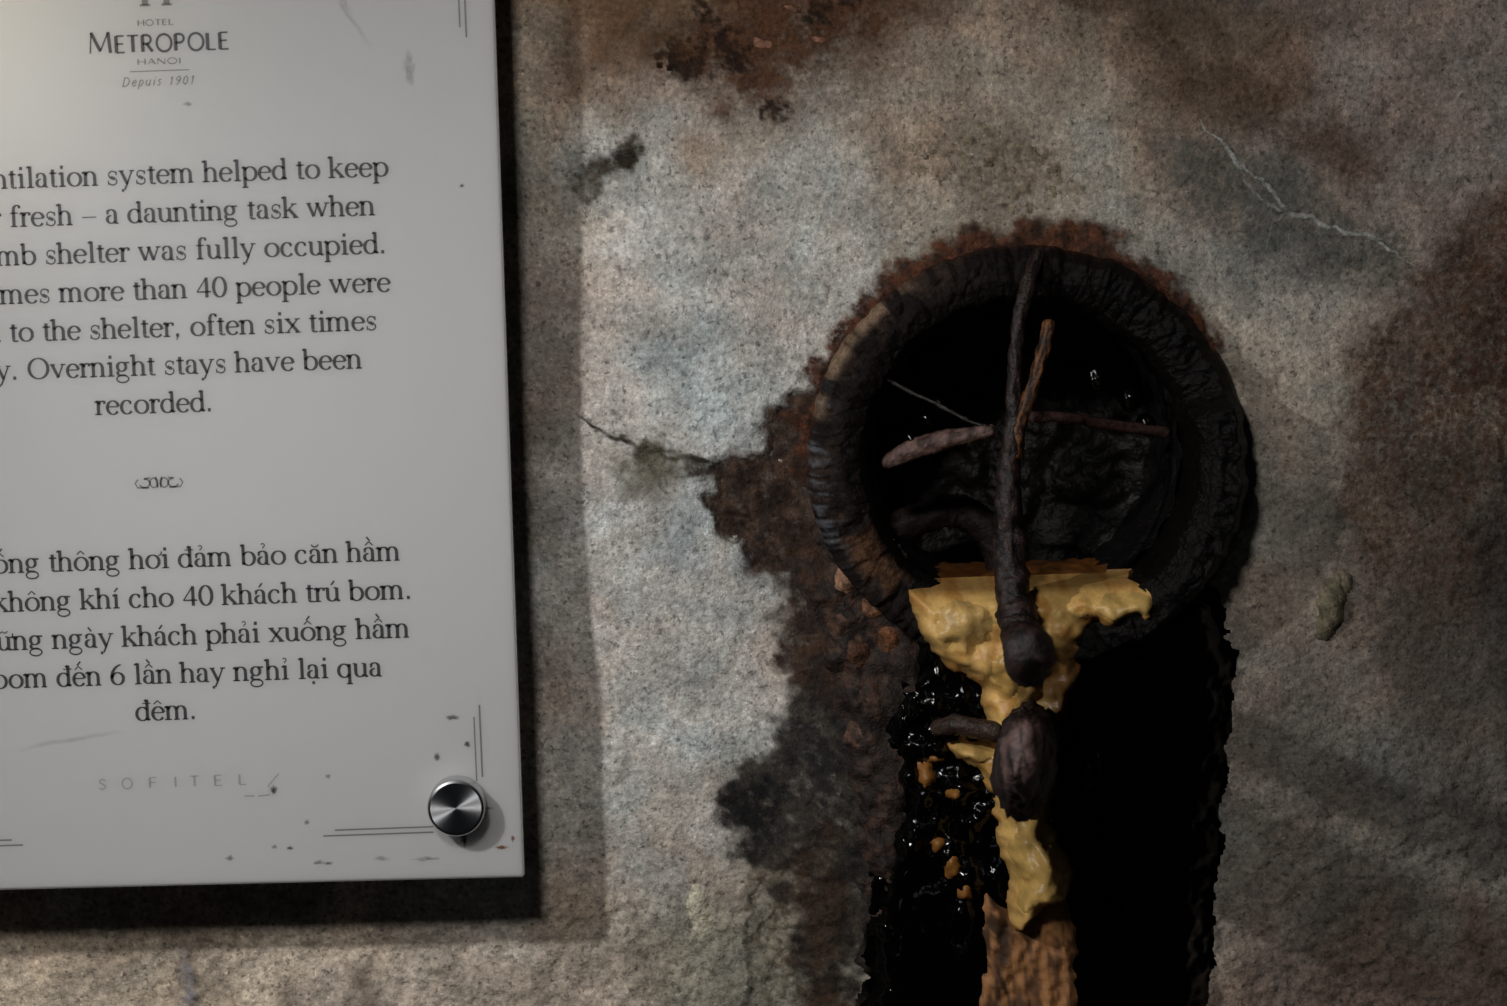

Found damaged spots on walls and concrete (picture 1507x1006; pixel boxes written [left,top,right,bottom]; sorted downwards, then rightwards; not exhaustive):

crack [580,416,710,491]
corrosion [779,216,1223,484]
crack [1203,126,1412,265]
damp [1143,0,1507,593]
corrosion [806,527,920,933]